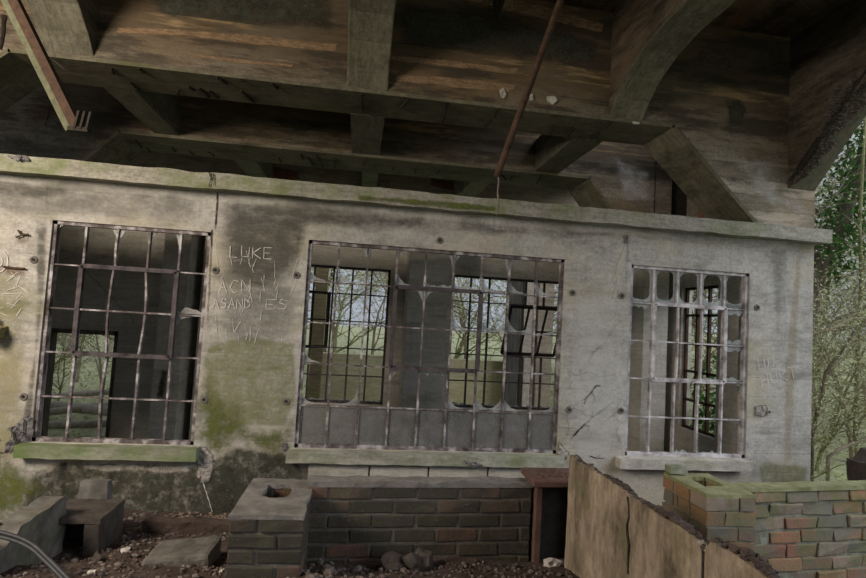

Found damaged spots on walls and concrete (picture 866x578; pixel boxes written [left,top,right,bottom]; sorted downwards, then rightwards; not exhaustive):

leakage [231,207,360,283]
crack [566,319,622,442]
crack [0,419,25,453]